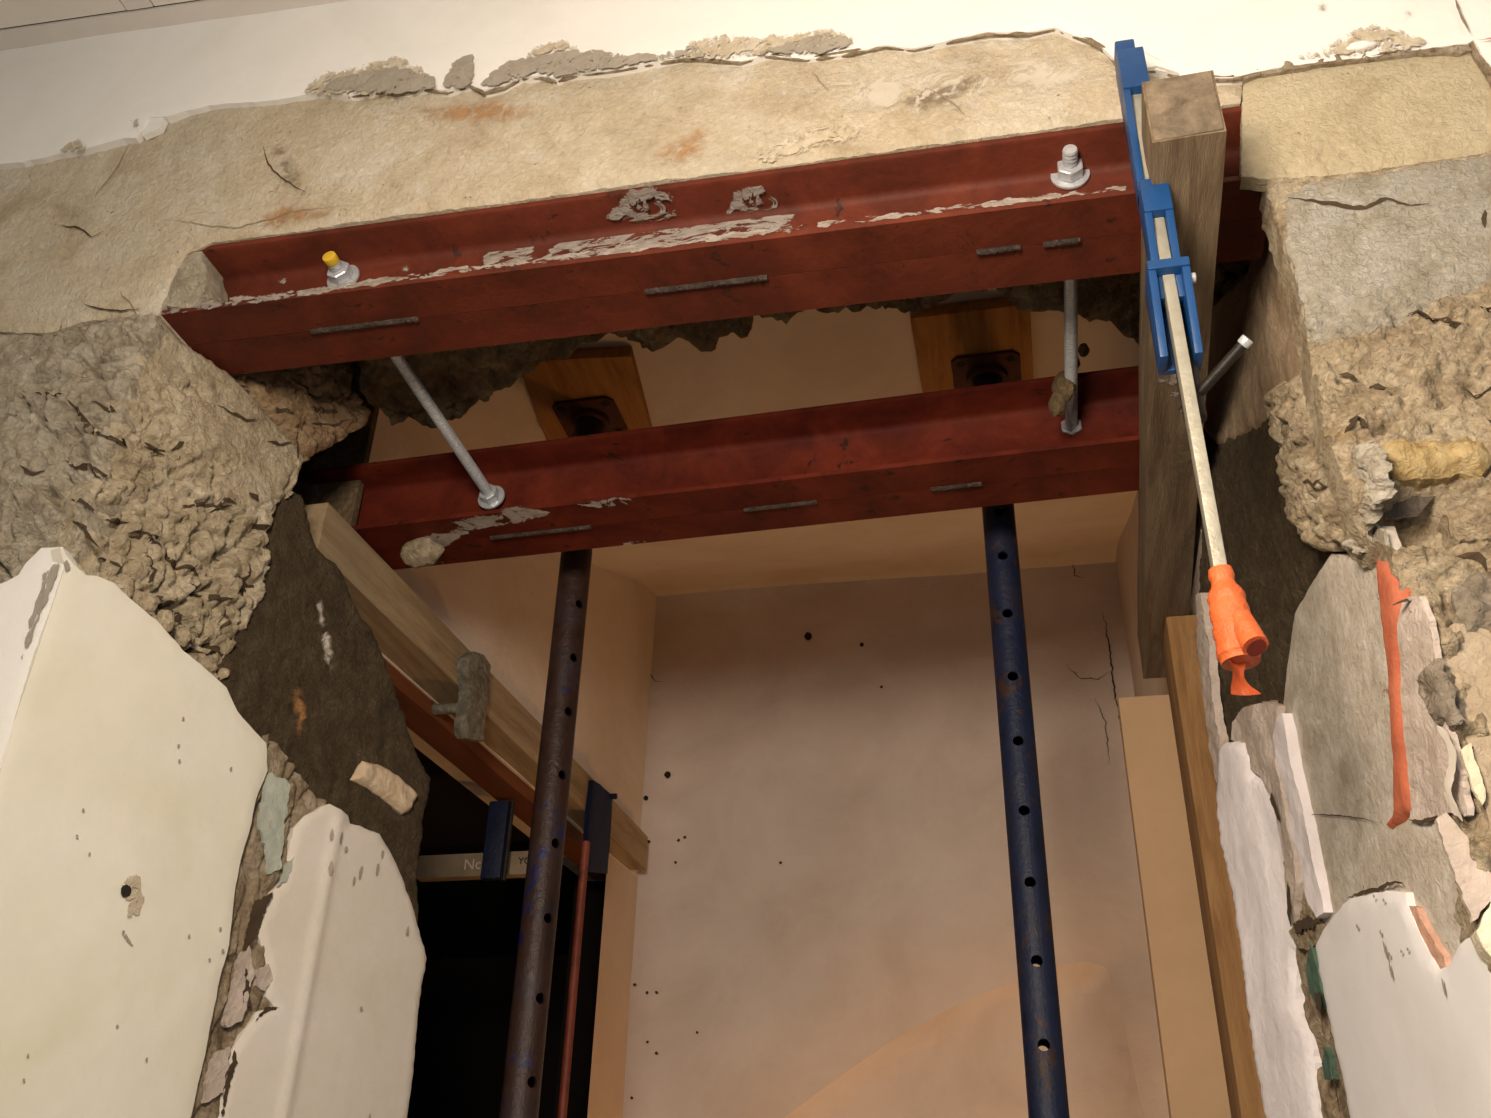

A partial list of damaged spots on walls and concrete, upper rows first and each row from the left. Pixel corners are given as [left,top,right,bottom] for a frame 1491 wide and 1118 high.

flaking render [305,29,1115,98]
flaking render [1144,51,1179,77]
flaking render [1214,24,1491,89]
crack [63,143,130,237]
crack [167,147,350,228]
crack [1288,197,1429,210]
crack [85,292,141,314]
spalling [1259,151,1491,660]
spalling [0,272,1140,680]
crack [1070,614,1121,756]
flaking render [1195,593,1229,784]
flaking render [1404,713,1491,969]